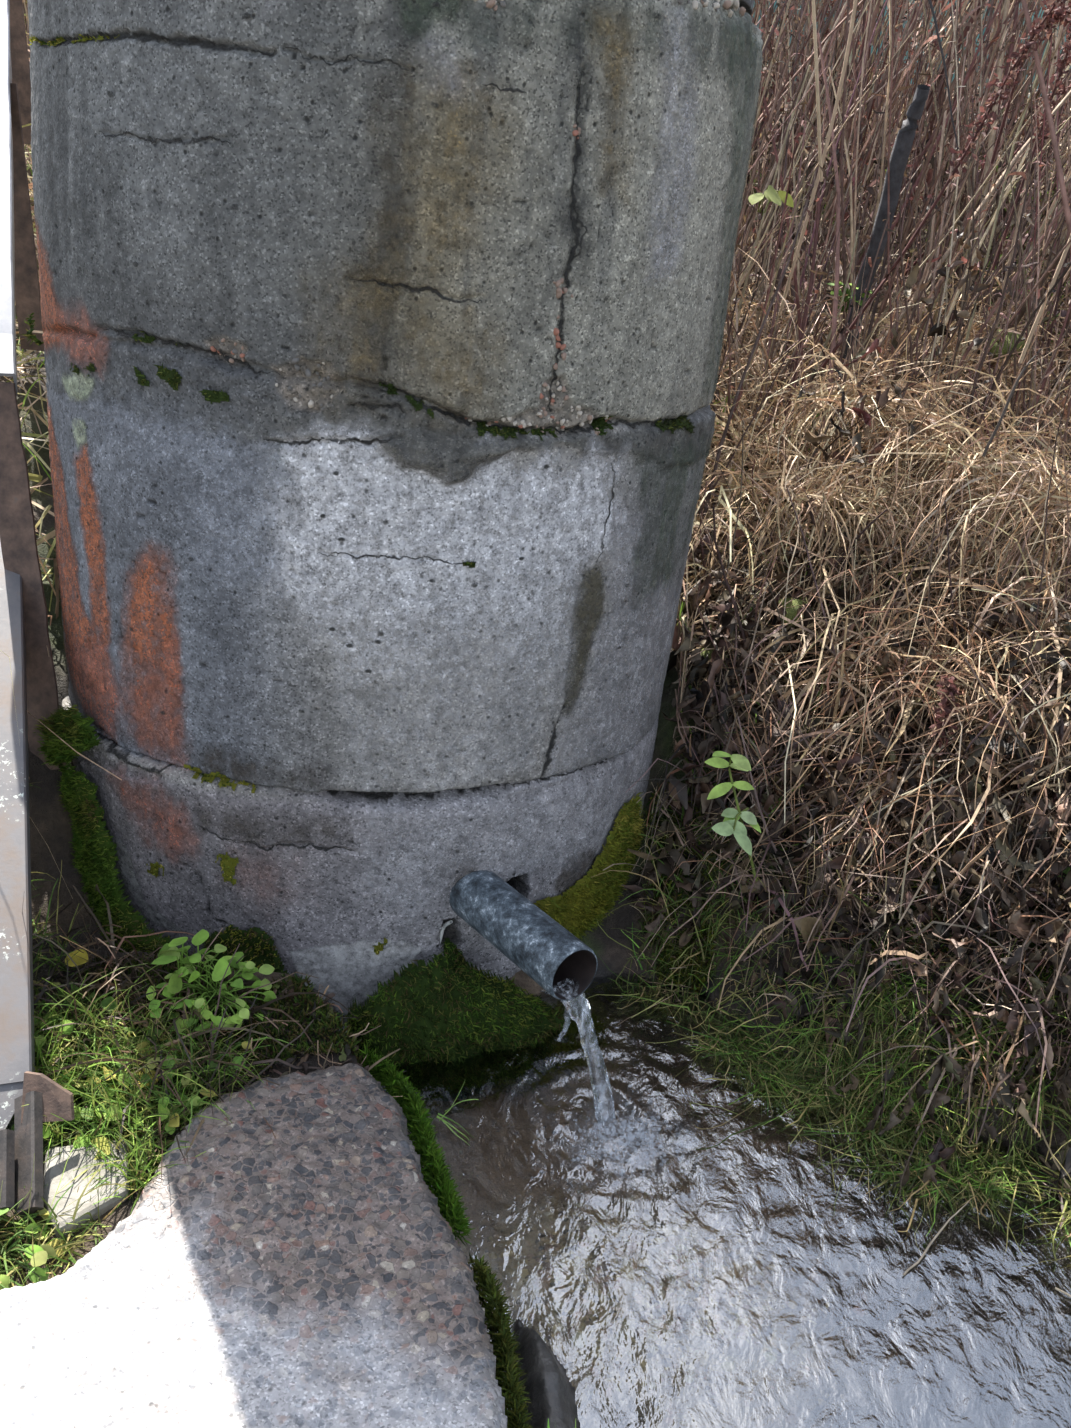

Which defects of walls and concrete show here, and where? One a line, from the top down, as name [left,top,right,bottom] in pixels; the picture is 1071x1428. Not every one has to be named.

crack [42,32,409,70]
rust [34,215,102,362]
crack [266,71,693,445]
rust [47,402,118,733]
peeling [124,278,640,680]
crack [317,552,463,565]
crack [597,463,615,561]
rust [126,556,181,747]
leakage [563,568,604,715]